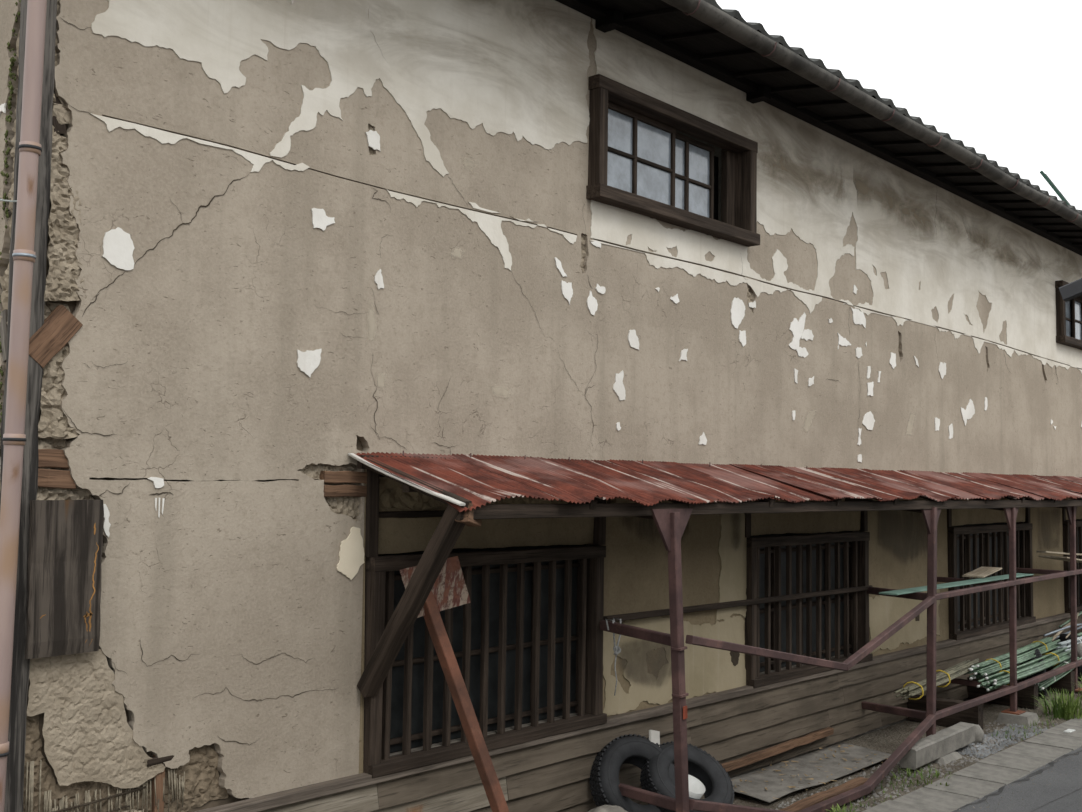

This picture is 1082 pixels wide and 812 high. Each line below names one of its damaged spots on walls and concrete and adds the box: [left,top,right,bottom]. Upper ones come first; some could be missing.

spalling [0,95,17,323]
spalling [44,94,87,320]
peeling [90,0,1082,400]
water stain [765,153,942,231]
spalling [38,345,79,449]
crack [371,362,407,450]
peeling [857,411,875,462]
peeling [934,397,988,439]
spalling [36,487,111,537]
peeling [148,477,164,488]
spalling [297,464,364,580]